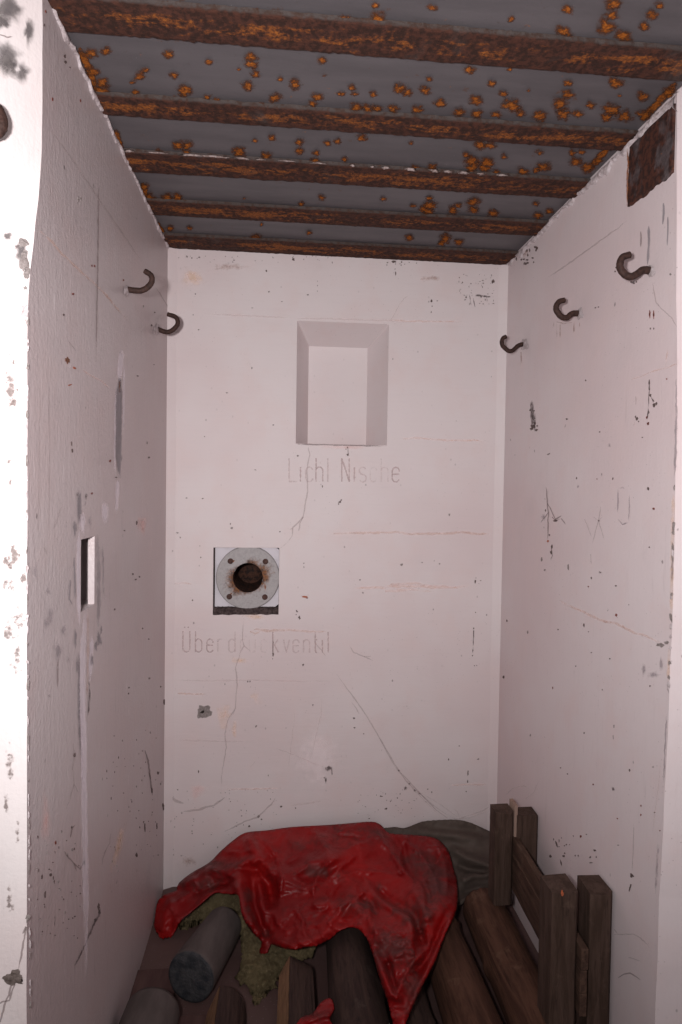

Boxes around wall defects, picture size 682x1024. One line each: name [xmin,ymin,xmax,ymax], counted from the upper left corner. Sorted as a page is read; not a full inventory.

rust [596,0,663,42]
rust [78,46,111,92]
rust [237,52,260,92]
rust [169,73,220,101]
rust [261,77,300,104]
rust [337,77,678,122]
rust [231,135,275,159]
rust [295,138,342,162]
rust [462,141,507,173]
rust [569,150,610,174]
rust [140,183,182,200]
rust [410,196,499,217]